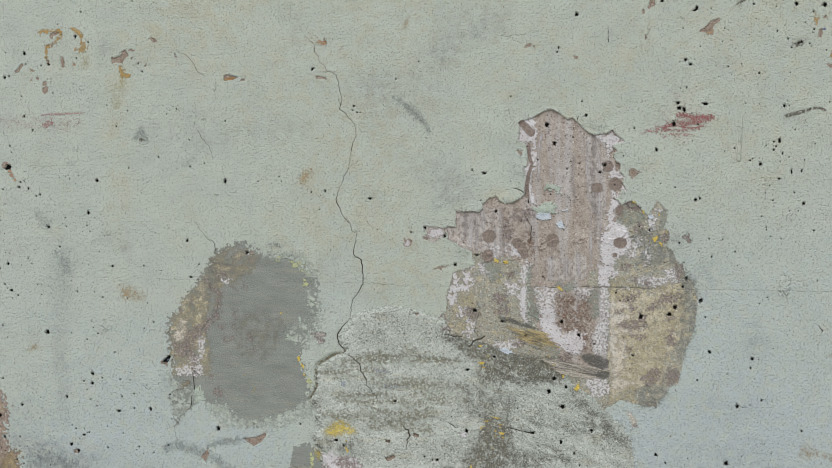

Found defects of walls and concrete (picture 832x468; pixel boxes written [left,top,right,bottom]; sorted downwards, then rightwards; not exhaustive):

peeling [423,109,702,427]
peeling [0,390,24,468]